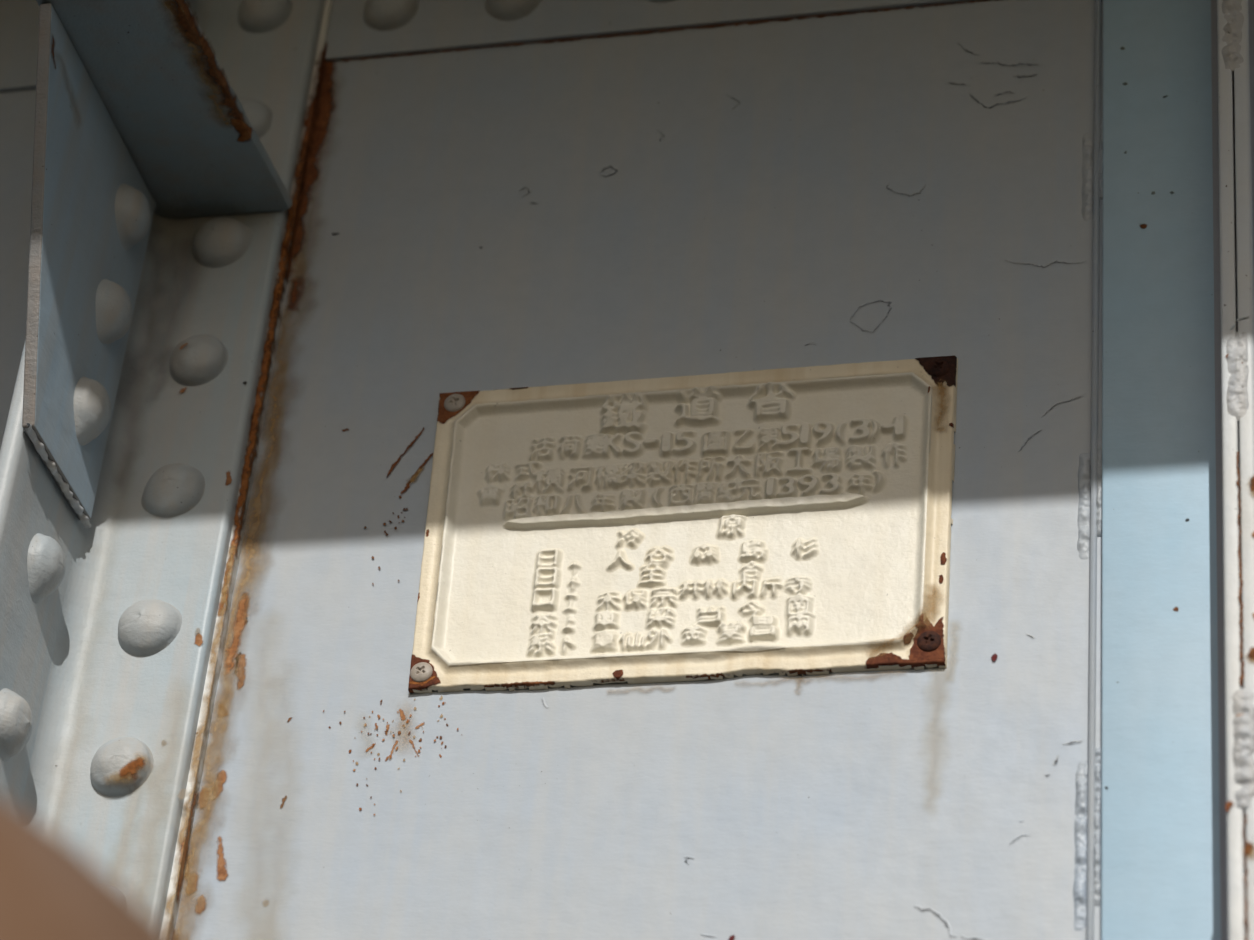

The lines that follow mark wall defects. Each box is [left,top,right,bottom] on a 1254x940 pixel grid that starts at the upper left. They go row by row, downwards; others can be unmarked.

crack [945,42,1040,108]
corrosion [163,0,989,940]
corrosion [107,757,146,782]
crack [914,905,986,940]